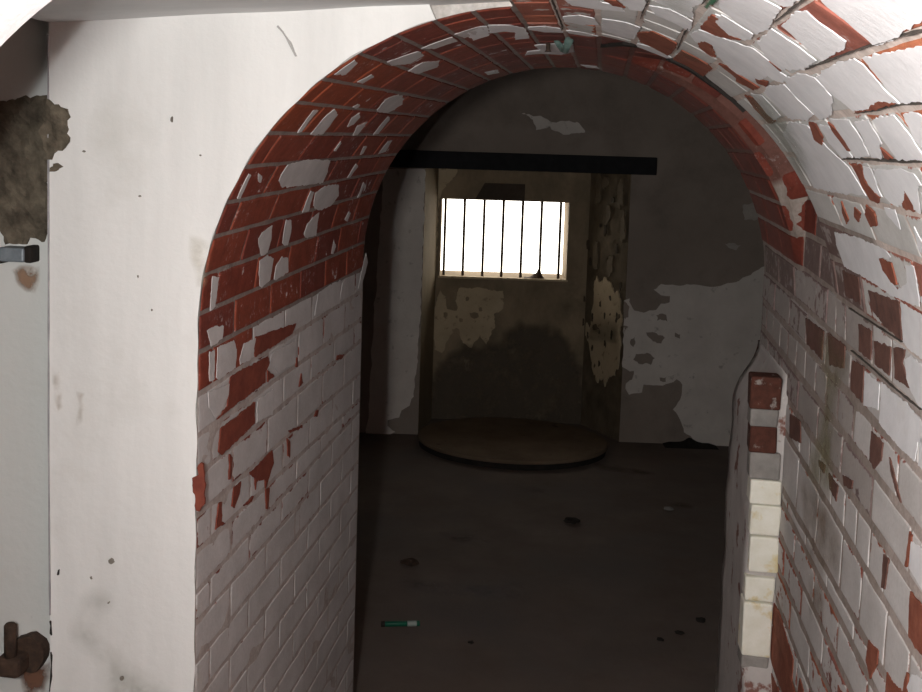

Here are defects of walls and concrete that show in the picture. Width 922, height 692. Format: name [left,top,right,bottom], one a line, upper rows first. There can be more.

spalling [0,95,71,245]
peeling [279,141,341,238]
rust [17,268,37,289]
peeling [258,225,289,288]
peeling [314,168,426,434]
peeling [387,0,922,503]
water stain [431,325,583,425]
peeling [207,323,303,530]
spalling [192,462,207,511]
peeling [904,531,922,655]
rust [22,668,47,692]
peeling [771,603,804,692]